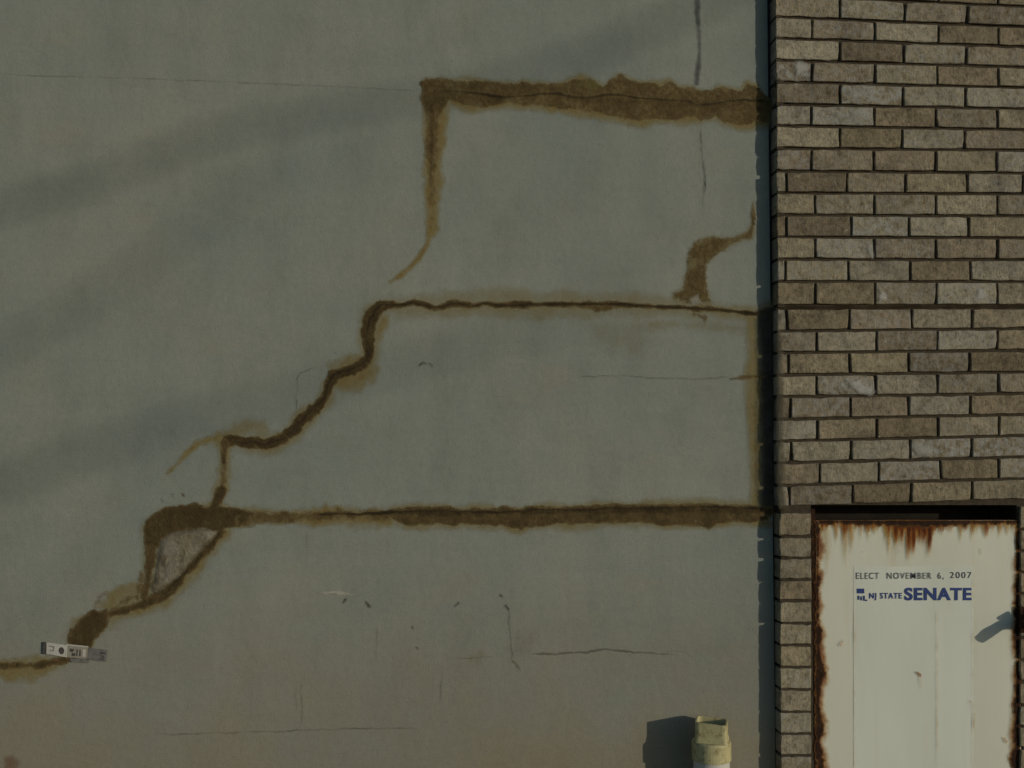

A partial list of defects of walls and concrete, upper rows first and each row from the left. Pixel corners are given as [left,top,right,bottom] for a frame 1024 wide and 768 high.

crack [451,0,766,105]
leakage [390,74,772,282]
leakage [68,204,784,648]
crack [233,302,1024,445]
spalling [150,529,217,593]
crack [324,505,765,515]
leakage [0,657,77,681]
corrosion [814,520,1022,768]